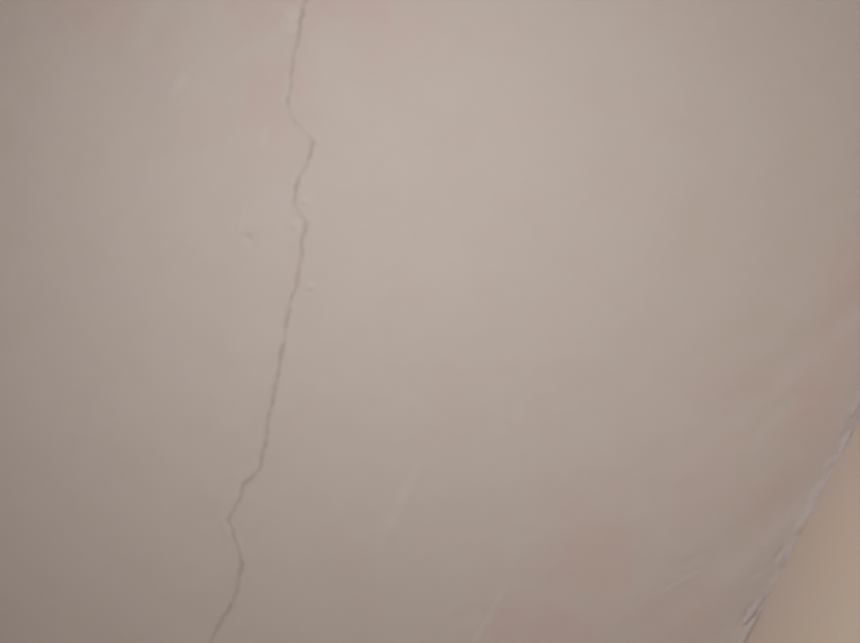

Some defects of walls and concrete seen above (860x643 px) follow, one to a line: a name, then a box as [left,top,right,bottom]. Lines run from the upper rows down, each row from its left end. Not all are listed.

crack [207,0,320,643]